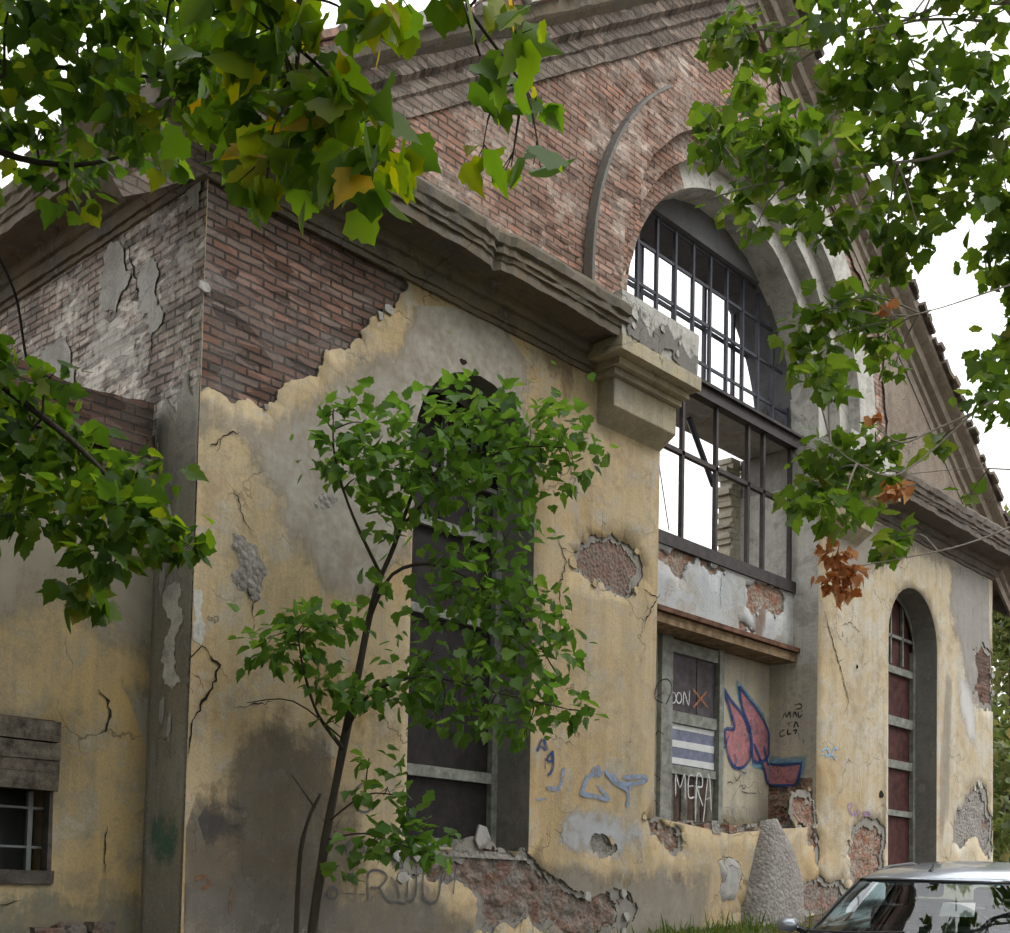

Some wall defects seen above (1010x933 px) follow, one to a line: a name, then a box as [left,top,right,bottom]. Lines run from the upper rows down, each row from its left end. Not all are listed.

flaking render [198,179,406,410]
peeling [200,306,534,600]
crack [98,689,112,734]
flaking render [158,563,205,741]
crack [187,645,226,754]
flaking render [568,534,642,599]
flaking render [658,549,727,579]
flaking render [739,582,783,633]
peeling [950,567,995,712]
spalling [390,825,637,933]
flaking render [787,788,885,917]
flaking render [953,781,992,859]